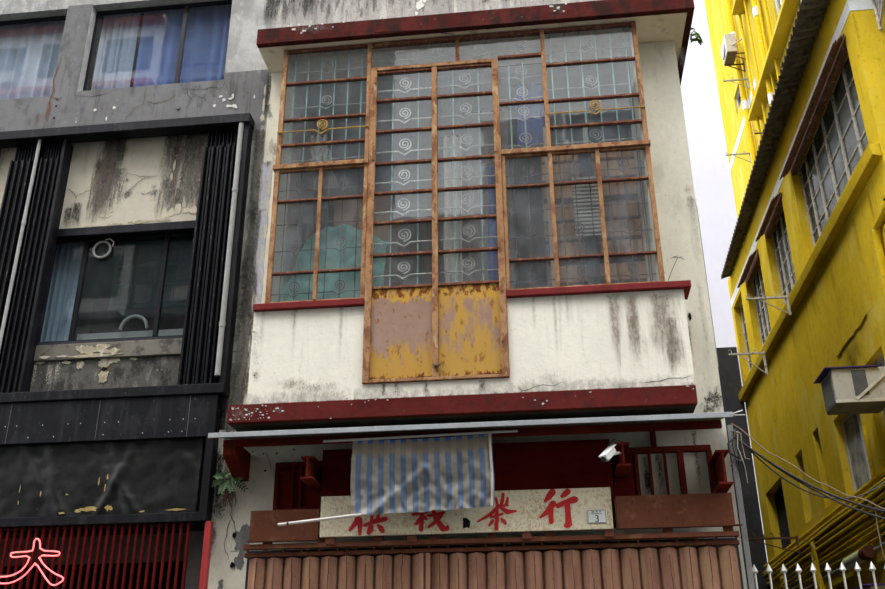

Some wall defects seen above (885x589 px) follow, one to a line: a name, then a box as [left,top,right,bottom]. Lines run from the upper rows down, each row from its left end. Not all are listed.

water stain [265,0,313,17]
water stain [64,139,130,222]
water stain [150,133,208,210]
water stain [223,129,276,440]
water stain [609,297,619,346]
water stain [628,296,639,347]
water stain [652,294,678,363]
spalling [36,344,138,383]
peeling [234,523,250,570]